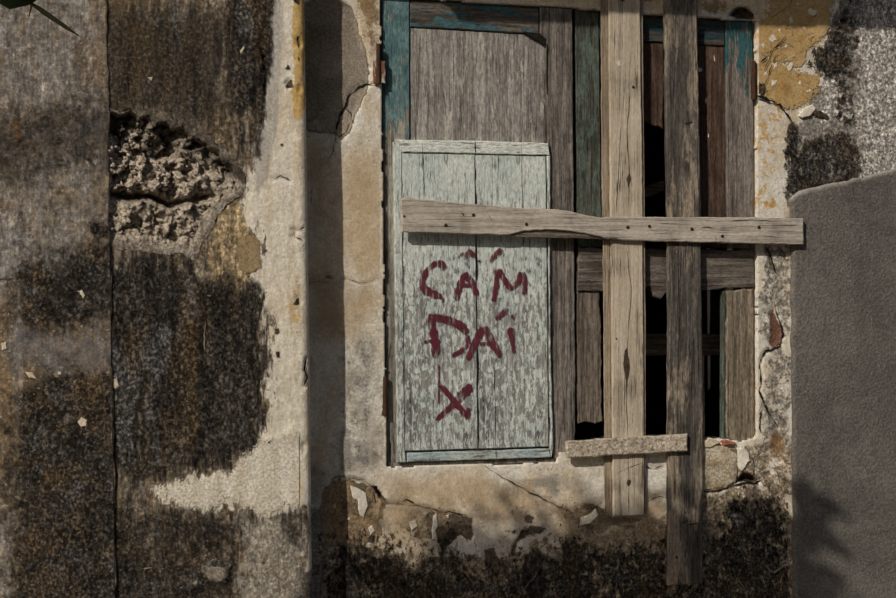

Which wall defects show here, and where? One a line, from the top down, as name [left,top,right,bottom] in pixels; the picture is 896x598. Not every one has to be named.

spalling [86,108,245,260]
peeling [285,0,378,139]
crack [330,84,371,157]
peeling [702,0,837,118]
crack [756,36,793,120]
water stain [781,120,866,206]
water stain [805,10,853,77]
crack [758,301,784,433]
peeling [320,478,382,554]
peeling [409,510,473,549]
crack [484,465,600,526]
water stain [312,476,788,598]